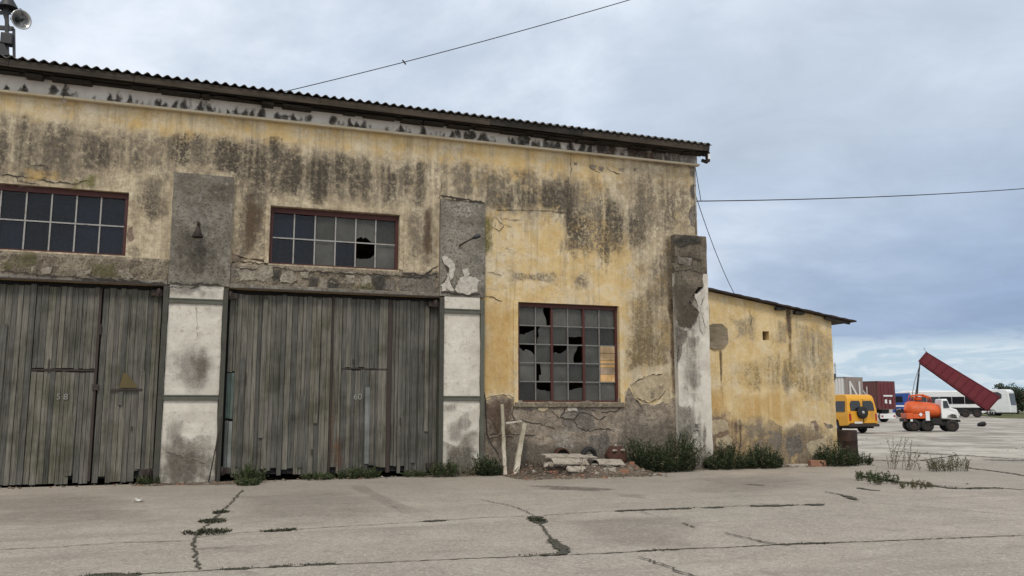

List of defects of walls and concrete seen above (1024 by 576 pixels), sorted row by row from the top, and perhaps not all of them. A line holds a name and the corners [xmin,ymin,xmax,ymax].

water stain [0,114,110,189]
water stain [329,116,365,128]
water stain [122,134,432,260]
peeling [344,256,479,295]
water stain [626,241,675,389]
peeling [671,166,706,389]
water stain [177,348,207,386]
water stain [163,424,211,483]
crack [489,404,621,439]
spalling [484,372,677,469]
crack [12,451,1024,576]